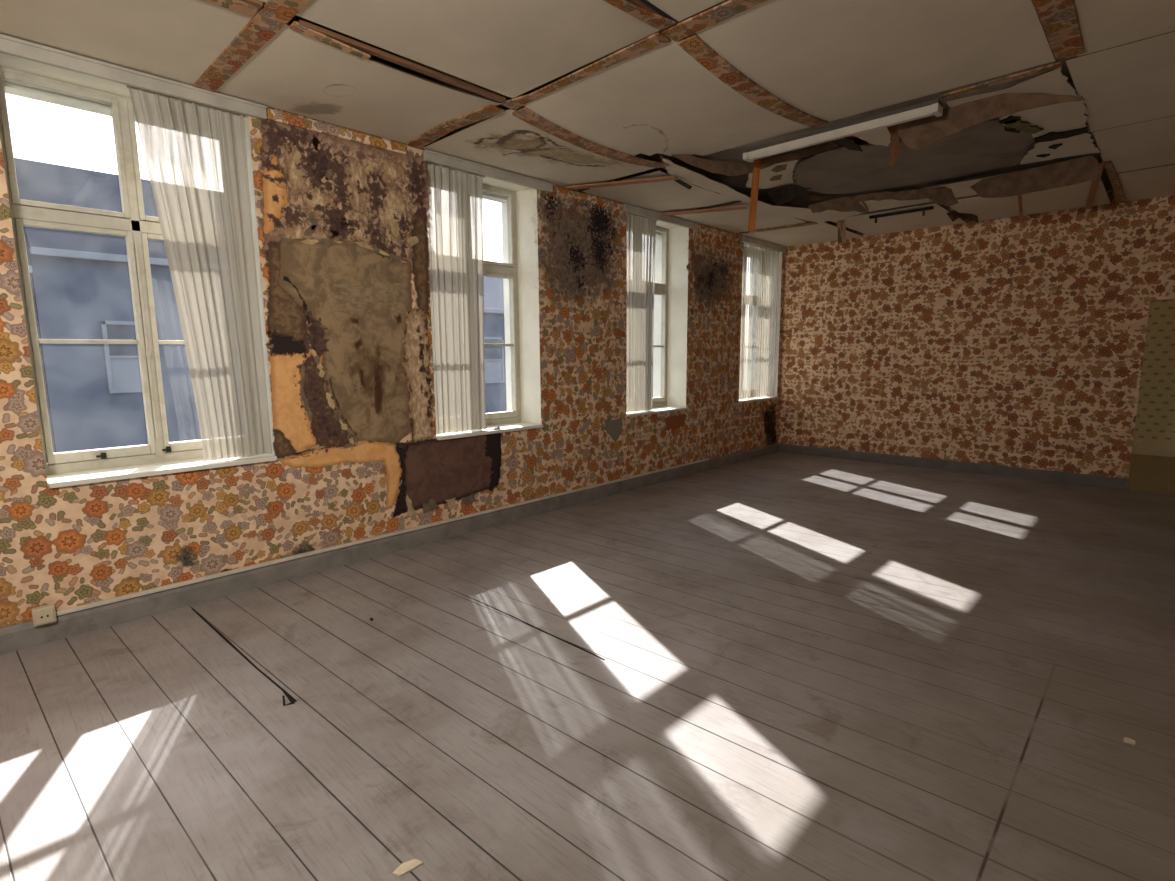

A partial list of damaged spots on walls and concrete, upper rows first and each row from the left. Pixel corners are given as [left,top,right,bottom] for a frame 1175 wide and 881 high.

flaking render [278,239,412,444]
leakage [260,119,432,272]
leakage [540,192,620,300]
leakage [686,247,730,307]